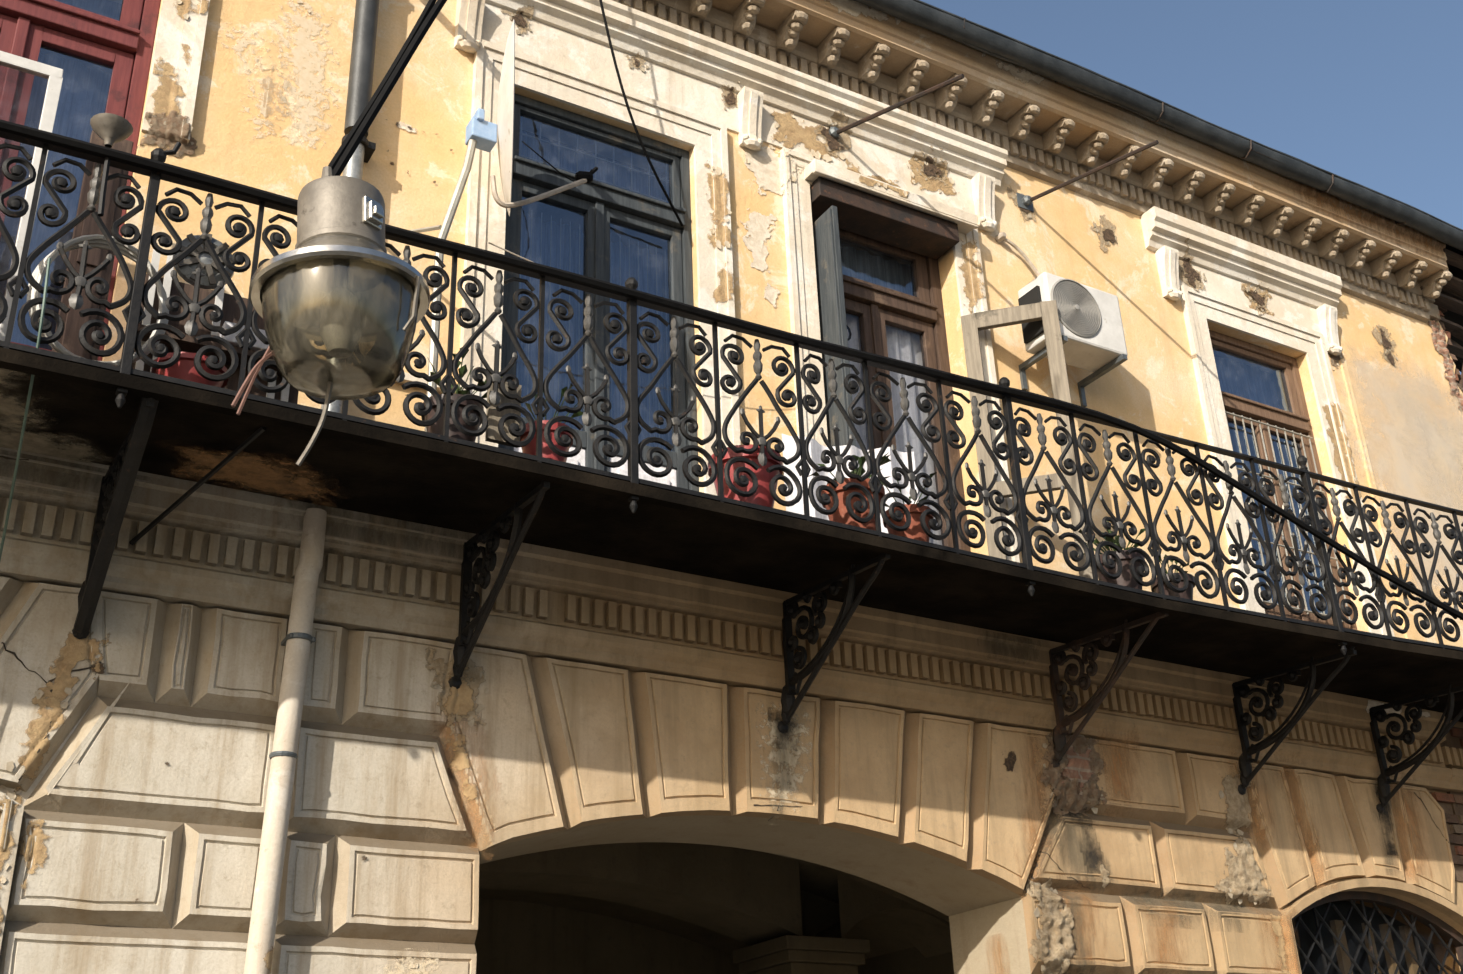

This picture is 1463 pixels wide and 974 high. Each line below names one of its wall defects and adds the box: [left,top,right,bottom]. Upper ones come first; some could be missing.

peeling [176,0,210,20]
spalling [137,44,198,158]
peeling [705,110,956,308]
crack [2,642,95,781]
flaking render [0,632,111,887]
spalling [426,647,489,744]
spalling [1040,730,1107,818]
damp [1051,810,1108,880]
flaking render [1214,774,1271,905]
flaking render [1431,792,1463,866]
peeling [384,948,440,974]
spalling [1025,879,1075,974]